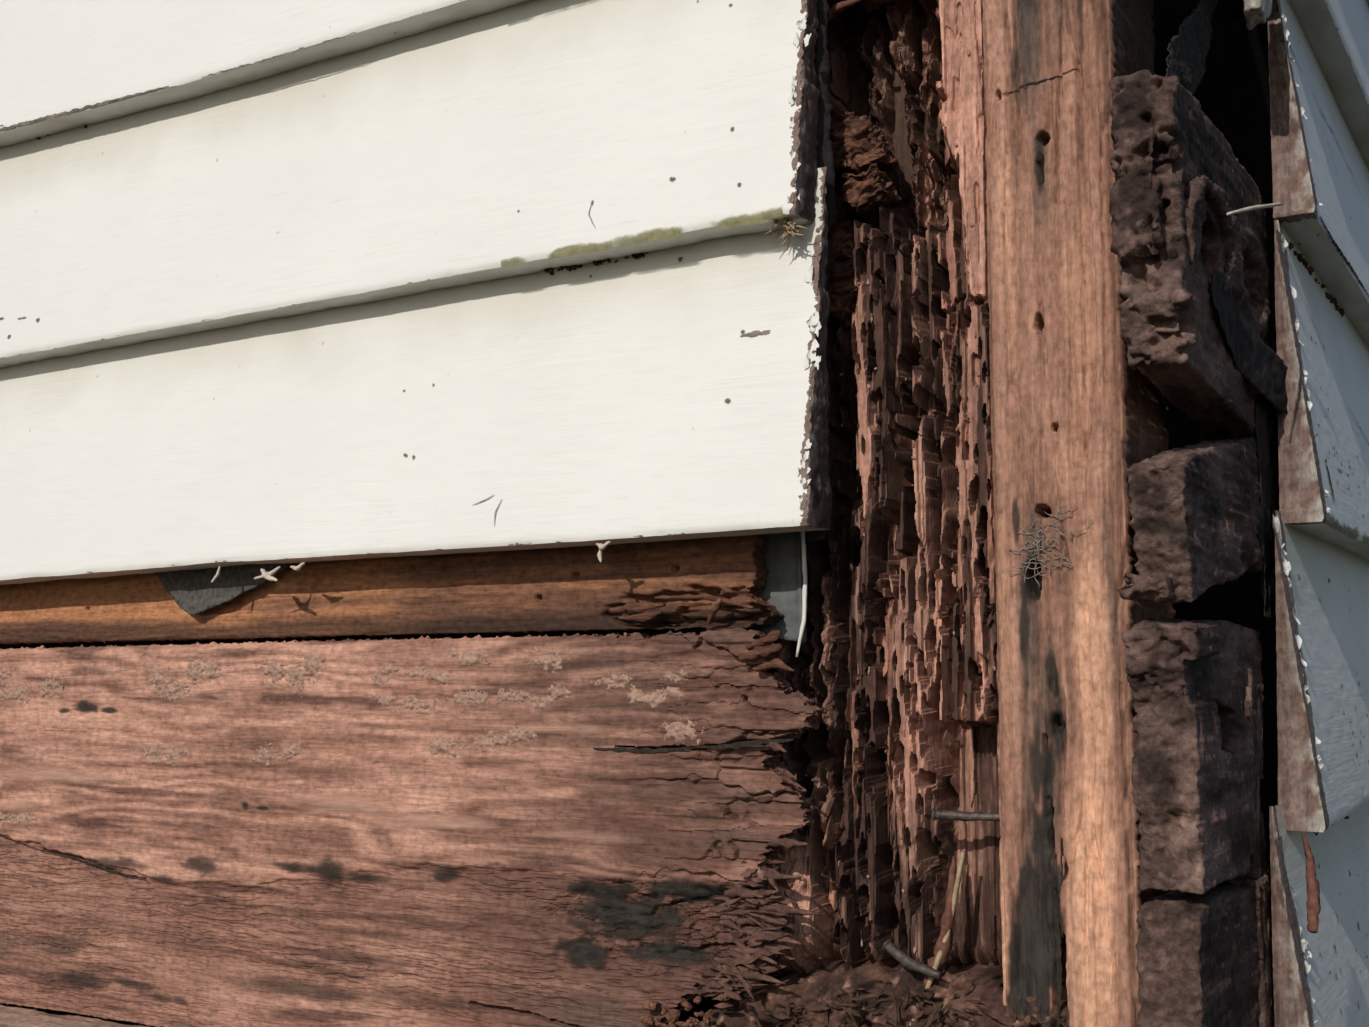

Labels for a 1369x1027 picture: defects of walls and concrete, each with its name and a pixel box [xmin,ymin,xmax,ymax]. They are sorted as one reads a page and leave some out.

peeling [1272,515,1327,807]
crack [0,834,146,881]
damp [557,879,726,968]
damp [1007,655,1067,1027]
peeling [1274,836,1336,1027]